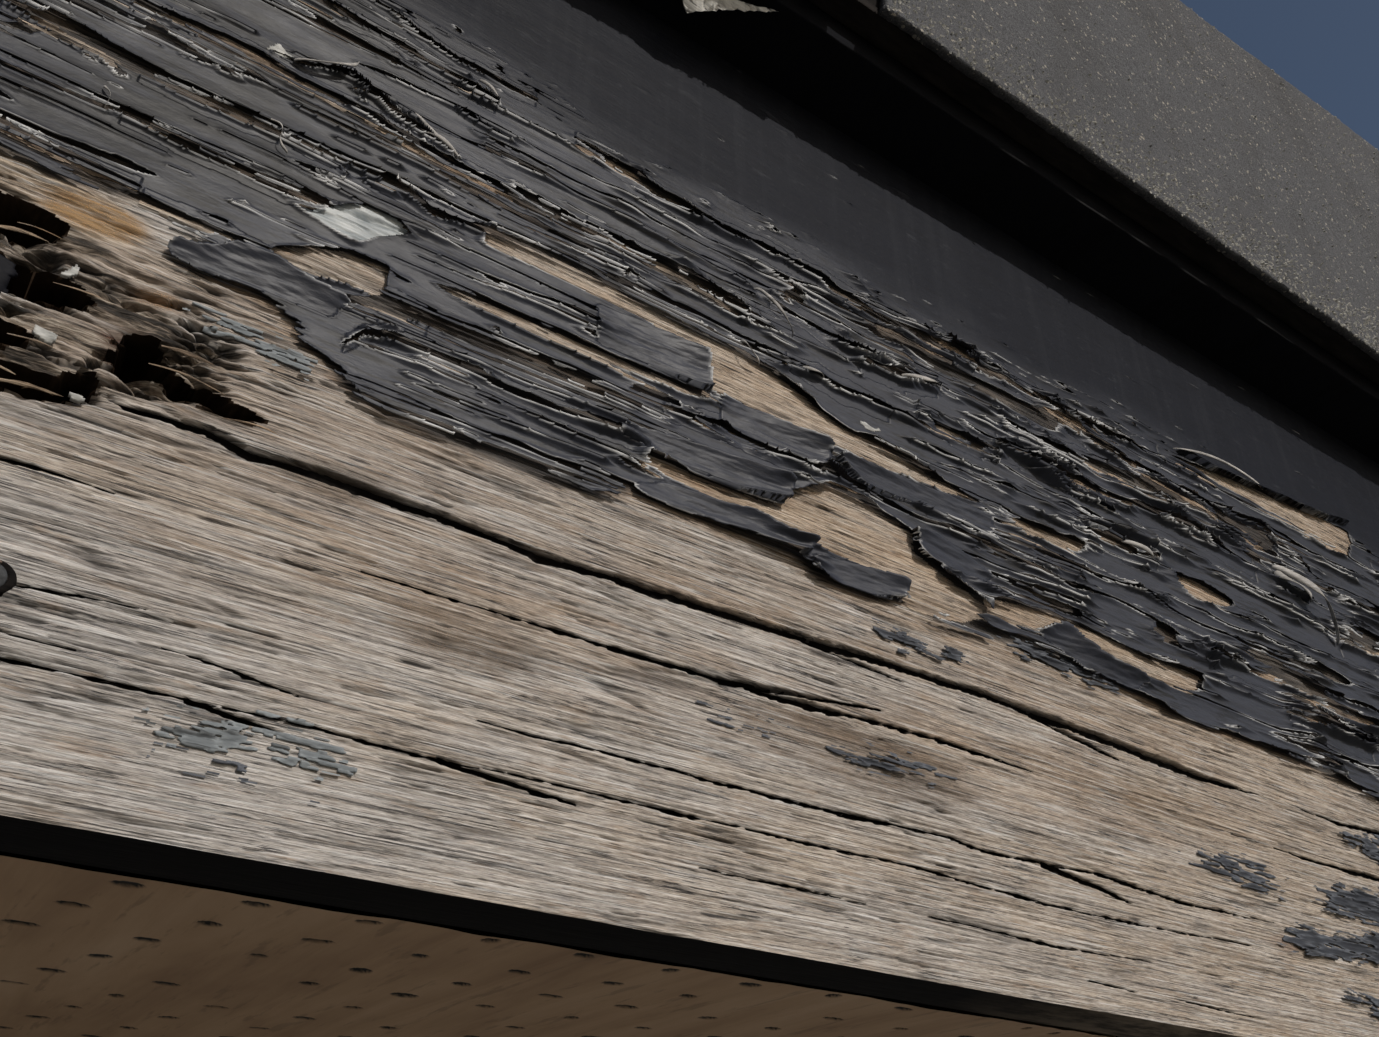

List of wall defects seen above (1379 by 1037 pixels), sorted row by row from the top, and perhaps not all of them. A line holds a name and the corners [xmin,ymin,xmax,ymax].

peeling [60,264,80,279]
peeling [68,392,85,405]
peeling [167,203,1200,696]
peeling [1161,451,1379,611]
crack [16,585,146,610]
crack [117,404,1263,796]
peeling [153,710,357,776]
crack [0,632,1274,992]
crack [1301,809,1379,835]
peeling [1189,850,1277,892]
crack [1274,848,1379,882]
peeling [1282,882,1379,964]